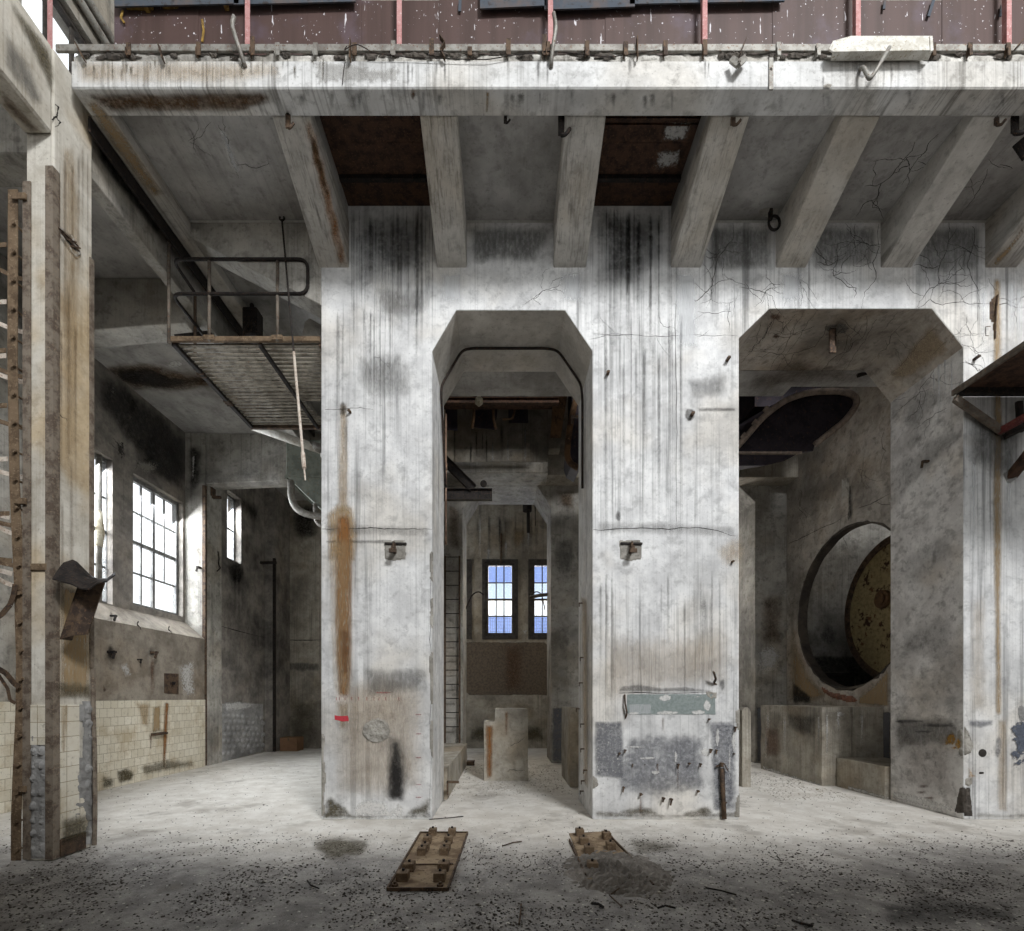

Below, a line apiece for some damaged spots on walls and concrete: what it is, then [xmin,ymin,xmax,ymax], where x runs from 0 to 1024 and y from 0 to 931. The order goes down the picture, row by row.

corrosion [308,125,343,263]
crack [593,138,1024,548]
corrosion [329,413,355,695]